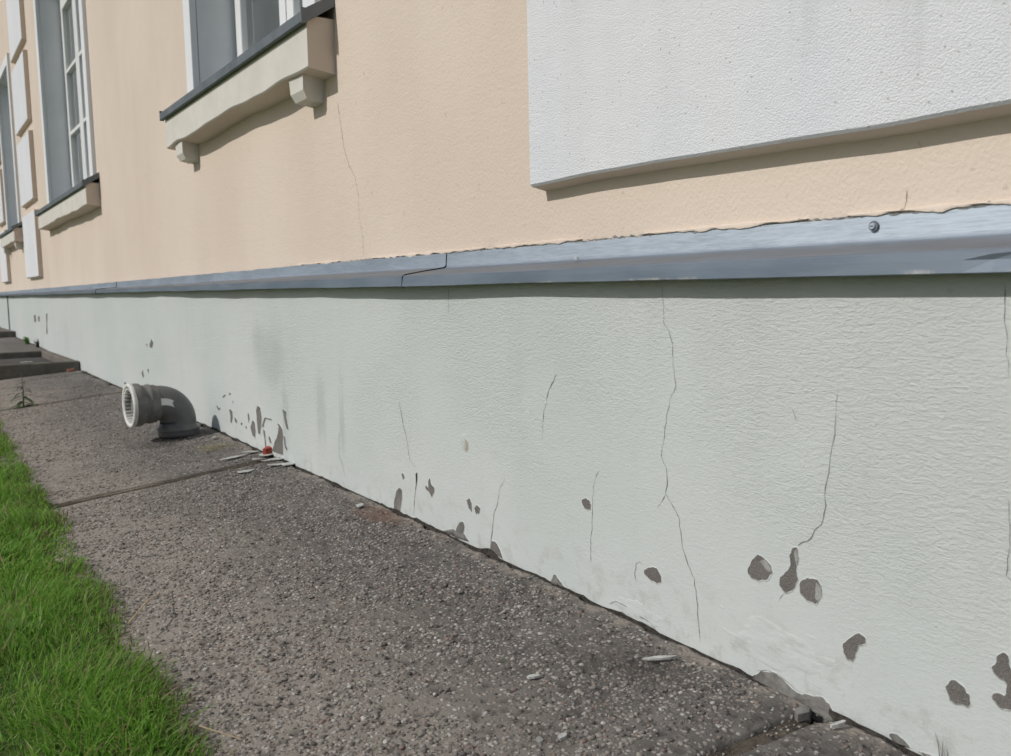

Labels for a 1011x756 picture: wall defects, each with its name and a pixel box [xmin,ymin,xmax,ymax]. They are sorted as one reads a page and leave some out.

crack [1002,283,1010,375]
peeling [216,392,289,460]
peeling [394,472,435,512]
crack [799,392,838,545]
flaking render [443,521,469,542]
peeling [644,566,662,585]
peeling [747,546,823,606]
peeling [842,632,867,663]
peeling [945,679,972,708]
peeling [991,651,1011,712]